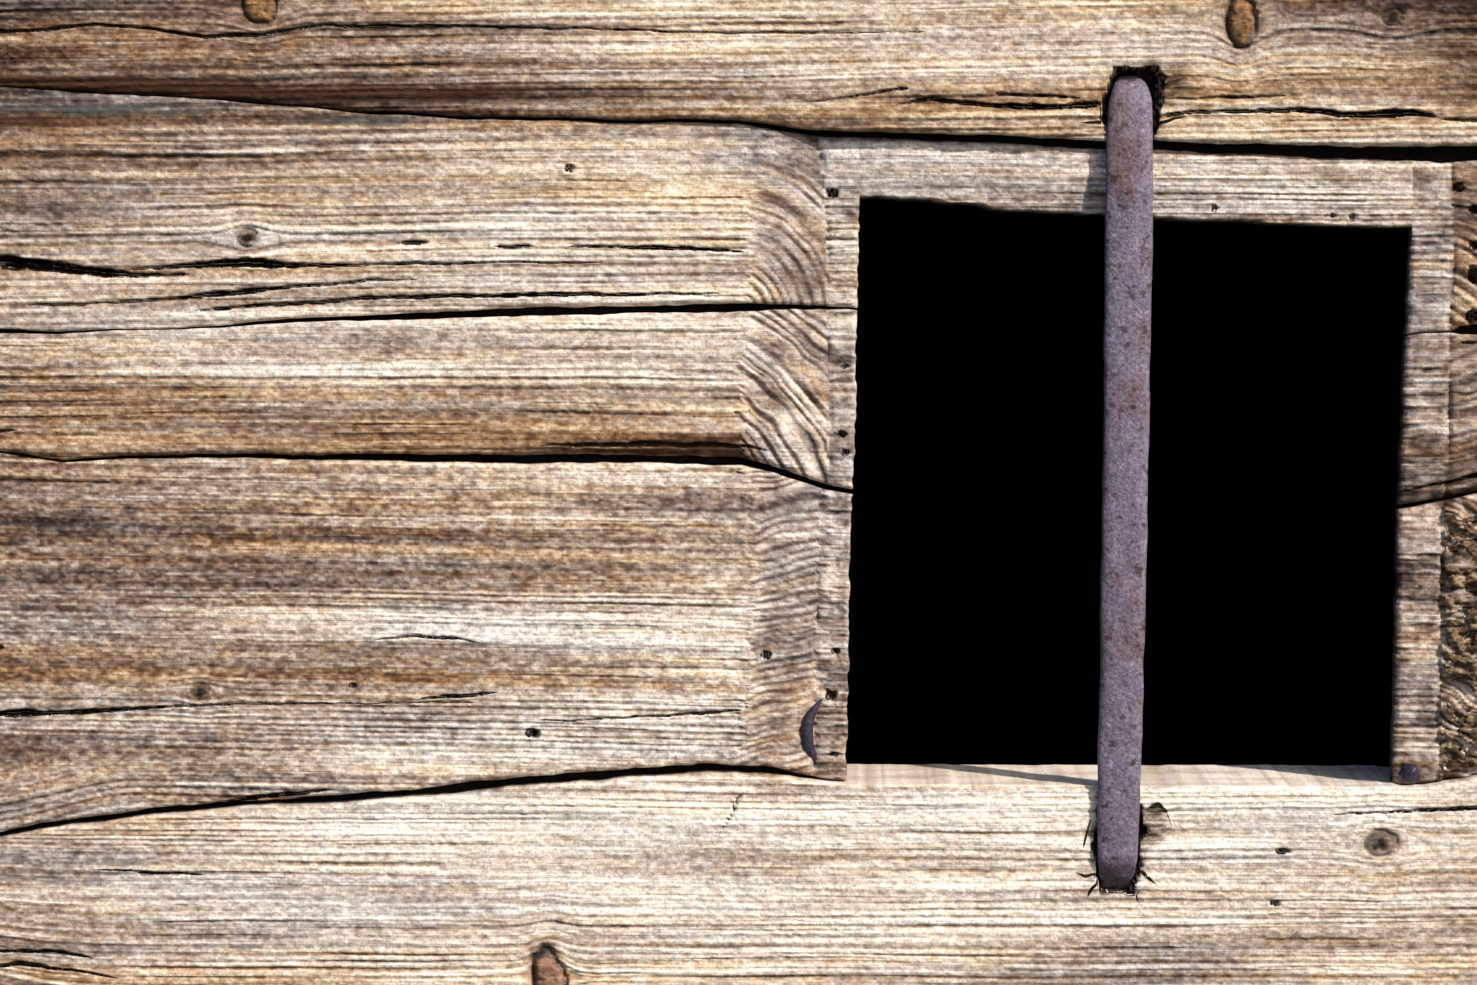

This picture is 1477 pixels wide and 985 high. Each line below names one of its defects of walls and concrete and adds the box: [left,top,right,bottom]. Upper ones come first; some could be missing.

crack [0,240,743,311]
crack [0,692,498,718]
crack [214,789,331,803]
crack [1333,806,1477,815]
crack [94,868,204,876]
crack [0,949,116,978]